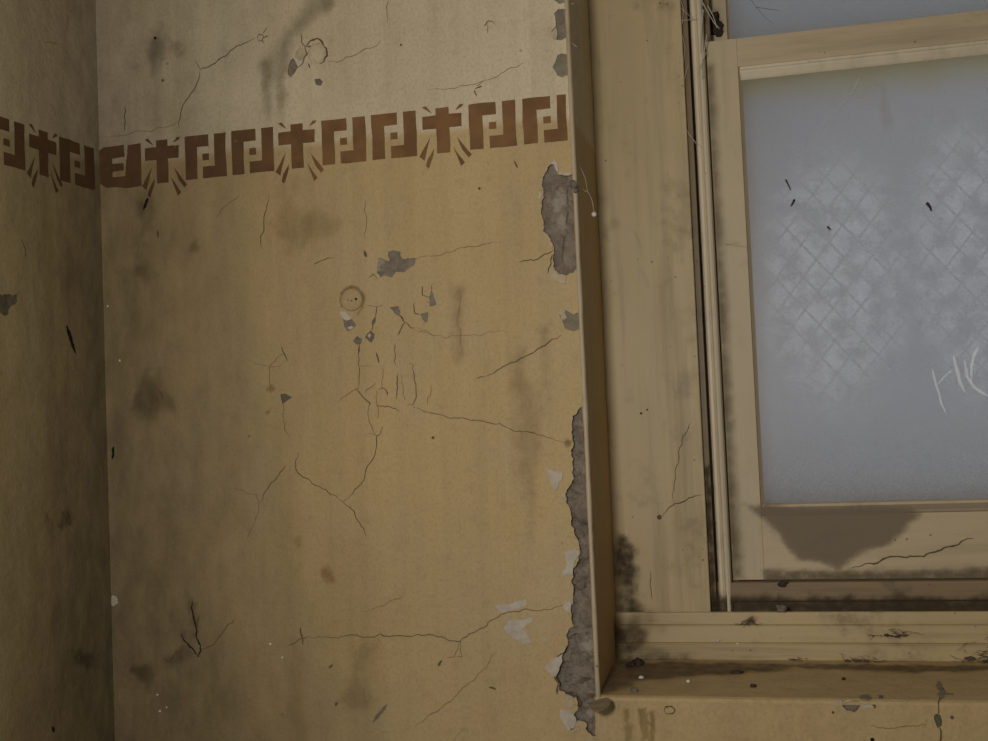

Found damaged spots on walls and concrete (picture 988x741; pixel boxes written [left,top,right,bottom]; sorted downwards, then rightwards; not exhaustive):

crack [104,27,267,137]
peeling [550,0,566,40]
peeling [553,54,568,77]
peeling [377,250,416,277]
spalling [519,160,576,284]
crack [477,335,561,379]
crack [236,347,561,539]
spalling [545,407,611,741]
crack [290,605,562,725]
crack [936,681,954,699]